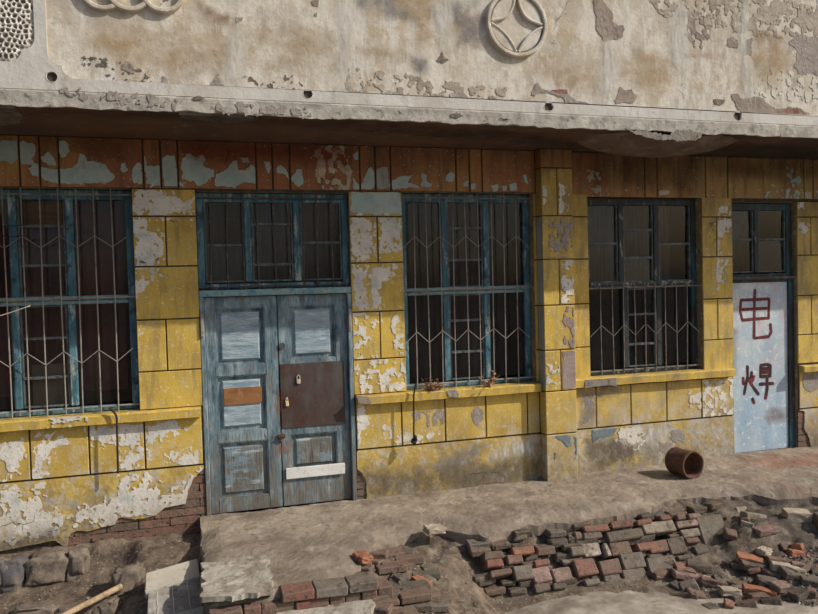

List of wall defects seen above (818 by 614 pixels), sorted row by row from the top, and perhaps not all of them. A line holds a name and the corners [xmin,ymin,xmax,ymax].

spalling [593,0,625,41]
spalling [82,56,150,82]
spalling [650,0,818,115]
spalling [0,106,26,126]
peeling [101,90,312,123]
peeling [264,161,304,187]
peeling [313,145,445,447]
peeling [542,181,648,458]
peeling [688,379,734,418]
spalling [0,416,206,547]
damp [366,440,542,493]